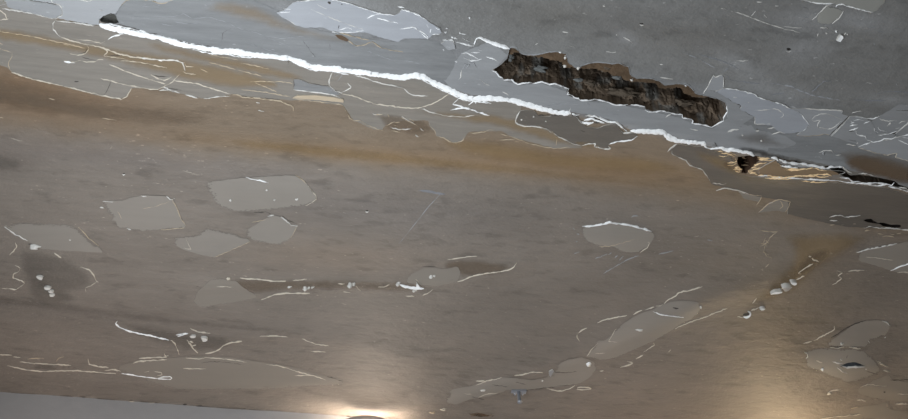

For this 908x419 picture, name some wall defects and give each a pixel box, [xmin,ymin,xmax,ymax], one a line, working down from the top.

damp [201,55,292,97]
crack [0,0,908,192]
peeling [0,0,908,237]
crack [0,322,242,380]